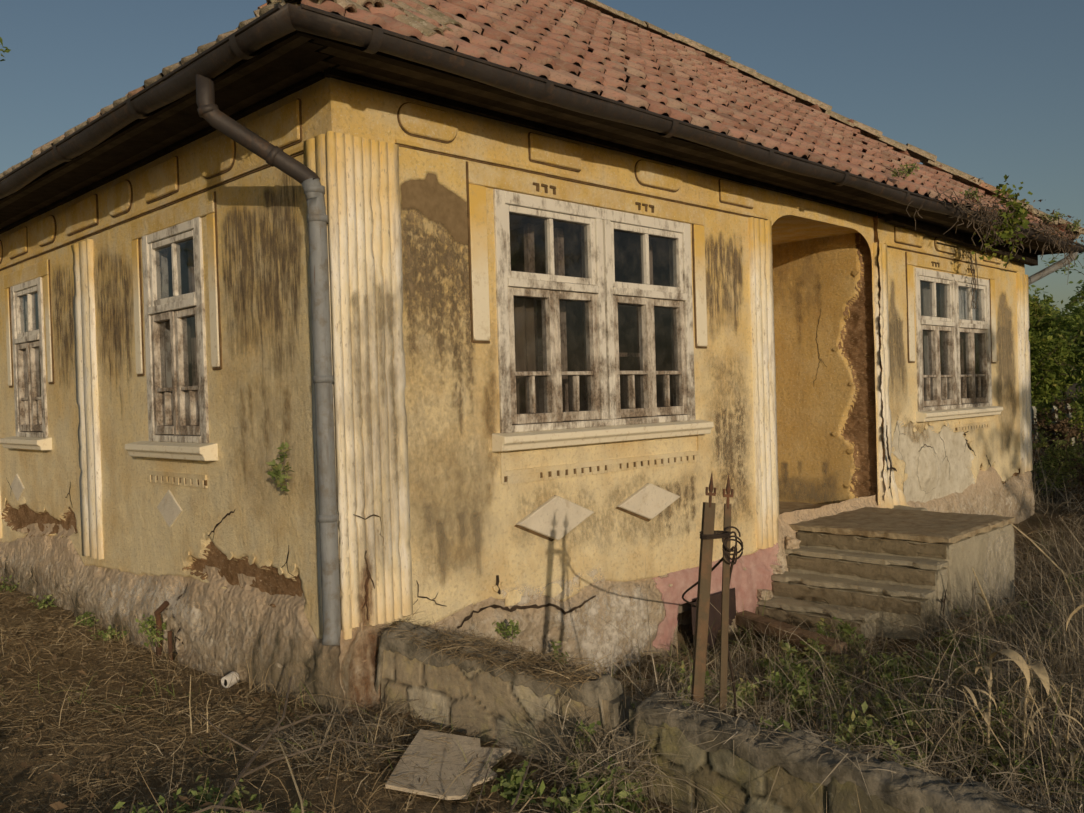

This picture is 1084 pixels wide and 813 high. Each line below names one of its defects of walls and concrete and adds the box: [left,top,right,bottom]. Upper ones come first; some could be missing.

water stain [97,256,131,357]
water stain [223,175,300,328]
water stain [401,173,473,420]
water stain [705,234,742,326]
spalling [832,213,1020,503]
water stain [996,293,1015,399]
water stain [716,408,747,513]
spalling [1,496,78,538]
crack [208,510,235,538]
spalling [182,531,303,607]
crack [353,514,384,621]
crack [413,580,447,607]